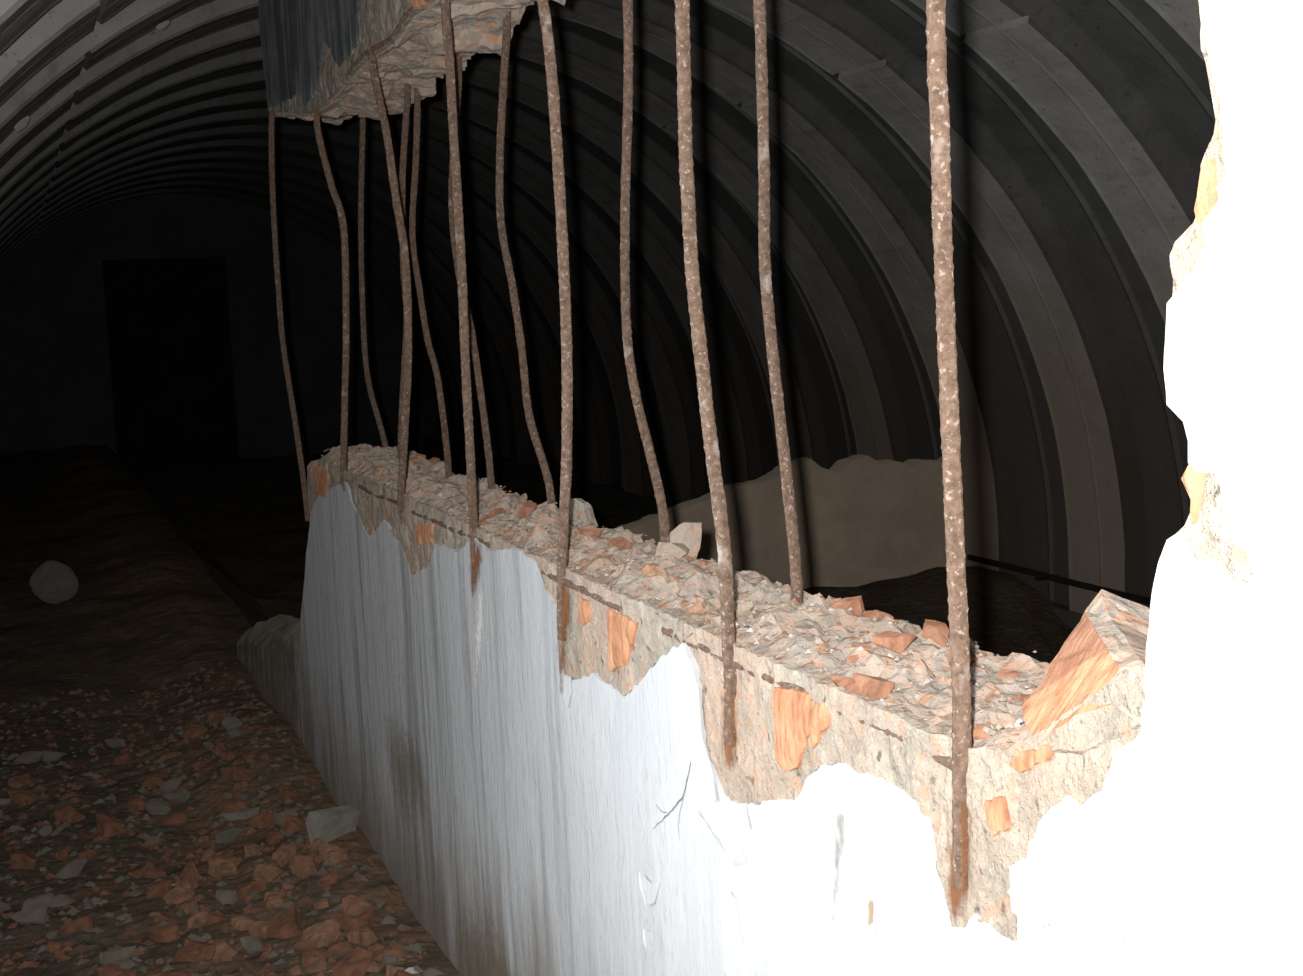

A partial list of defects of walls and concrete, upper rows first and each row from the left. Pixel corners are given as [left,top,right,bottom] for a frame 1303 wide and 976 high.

flaking render [1169,0,1226,296]
corrosion [471,543,481,591]
flaking render [268,0,1150,941]
flaking render [1177,464,1253,583]
corrosion [558,583,569,673]
corrosion [721,695,734,765]
crack [653,761,691,841]
corrosion [948,805,968,917]